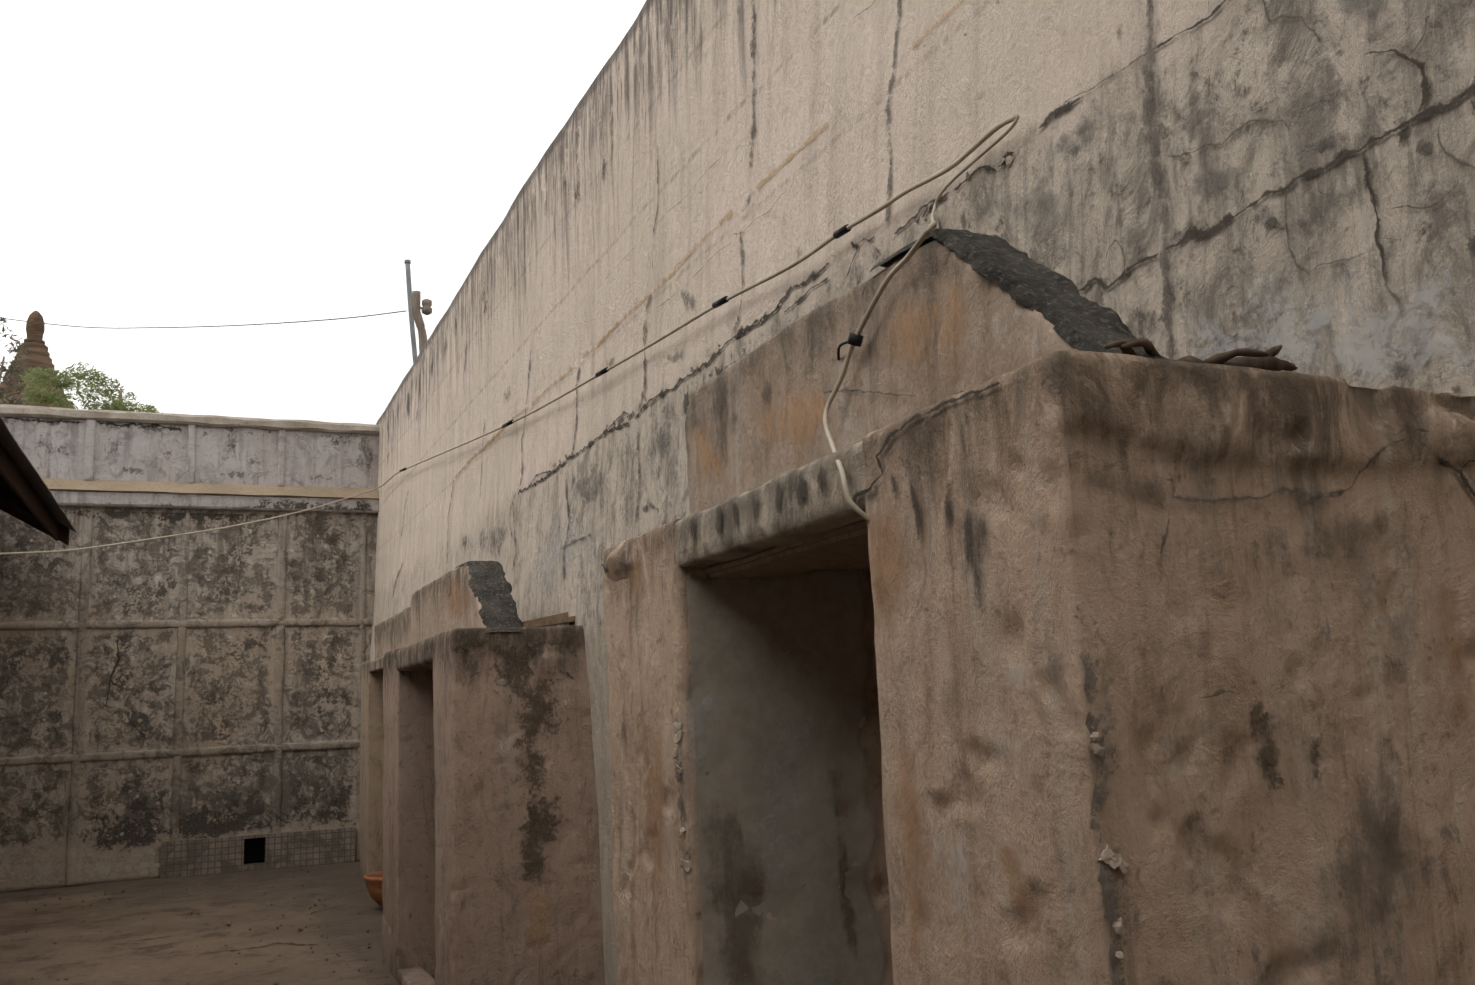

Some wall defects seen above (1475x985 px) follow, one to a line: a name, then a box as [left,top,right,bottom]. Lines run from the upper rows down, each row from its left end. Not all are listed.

crack [856,0,906,297]
spalling [894,151,1014,234]
spalling [1039,96,1083,129]
crack [1065,0,1475,359]
crack [563,369,608,581]
spalling [518,263,828,493]
water stain [890,474,921,539]
water stain [945,496,986,607]
crack [1161,428,1475,552]
water stain [456,628,575,881]
water stain [687,569,886,985]
water stain [1250,704,1284,788]